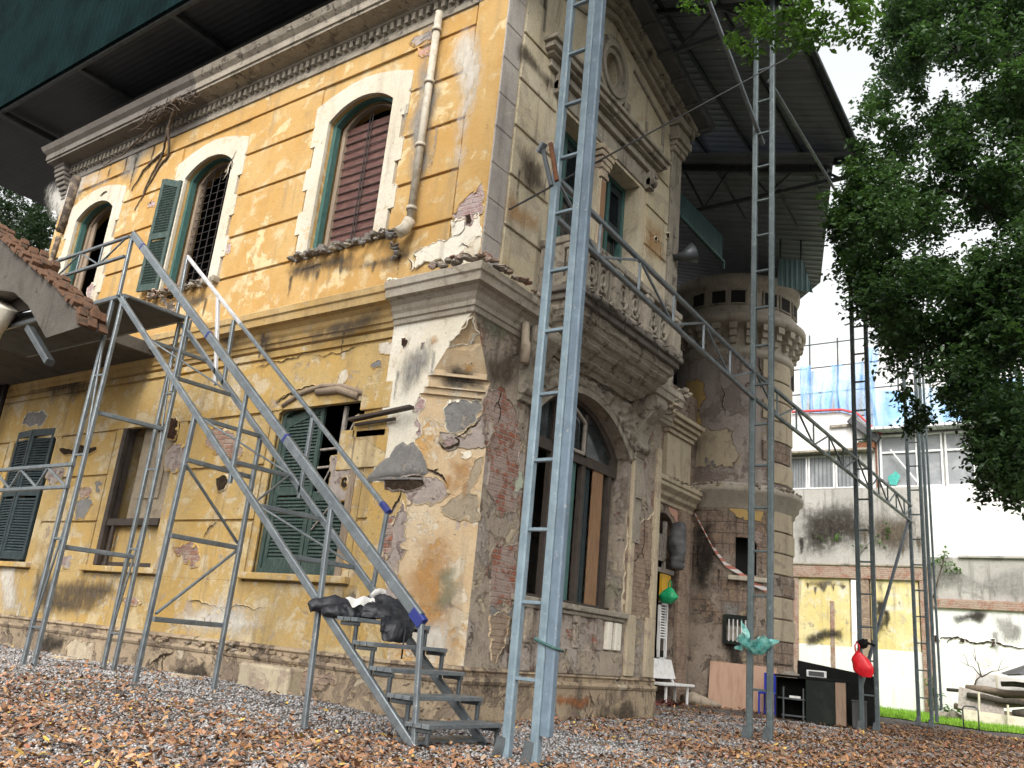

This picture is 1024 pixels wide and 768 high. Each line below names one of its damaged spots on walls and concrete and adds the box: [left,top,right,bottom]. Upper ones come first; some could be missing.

damp [511,153,546,225]
peeling [287,182,541,299]
spalling [205,427,244,460]
crack [427,389,502,485]
peeling [74,479,103,522]
spalling [382,385,524,599]
damp [799,508,921,553]
spalling [172,542,201,569]
damp [35,576,111,610]
spalling [488,542,519,665]
damp [807,630,841,644]
crack [940,636,1024,649]